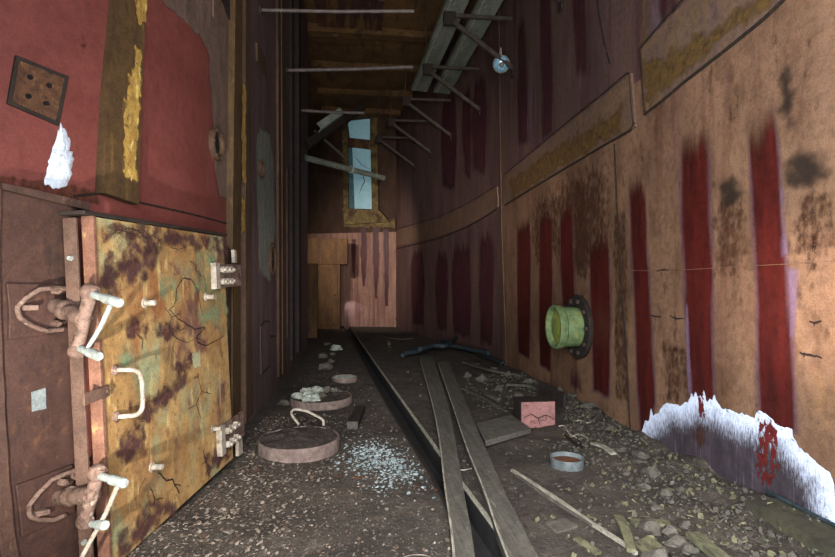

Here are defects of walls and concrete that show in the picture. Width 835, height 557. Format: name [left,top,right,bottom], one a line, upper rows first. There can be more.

crack [110,227,157,249]
crack [164,245,225,353]
rust [126,317,180,342]
rust [116,353,198,463]
rust [204,447,231,476]
peeling [642,390,835,523]
crack [139,472,181,510]
rust [118,500,176,557]